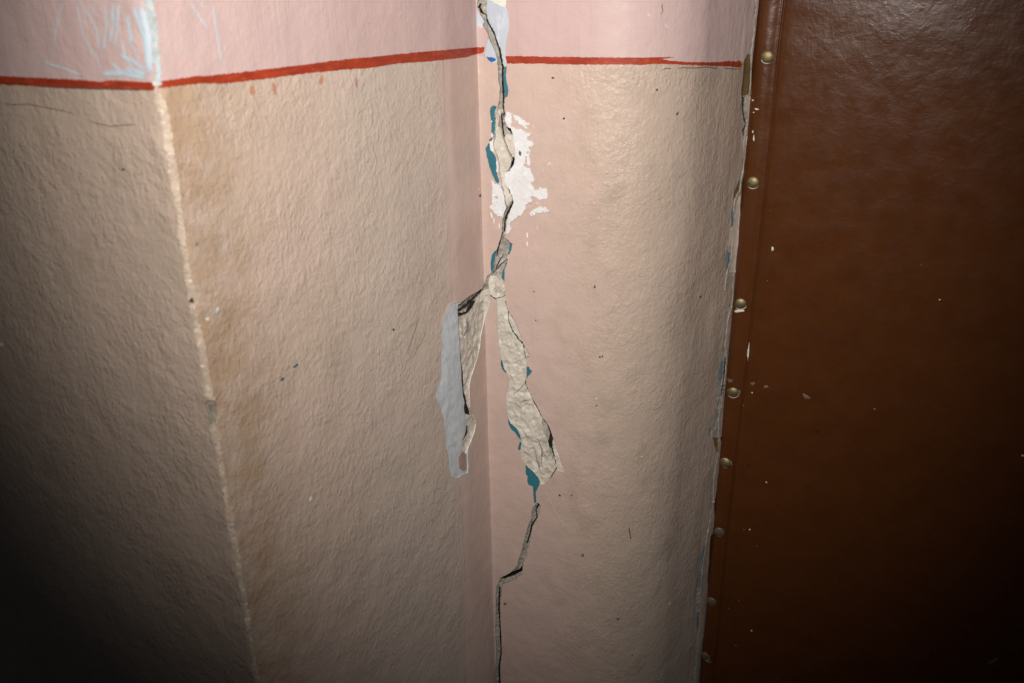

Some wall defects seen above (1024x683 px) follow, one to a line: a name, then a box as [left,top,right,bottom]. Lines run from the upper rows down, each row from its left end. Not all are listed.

peeling [477,0,509,186]
crack [477,0,515,283]
spalling [436,243,564,503]
crack [495,503,541,683]